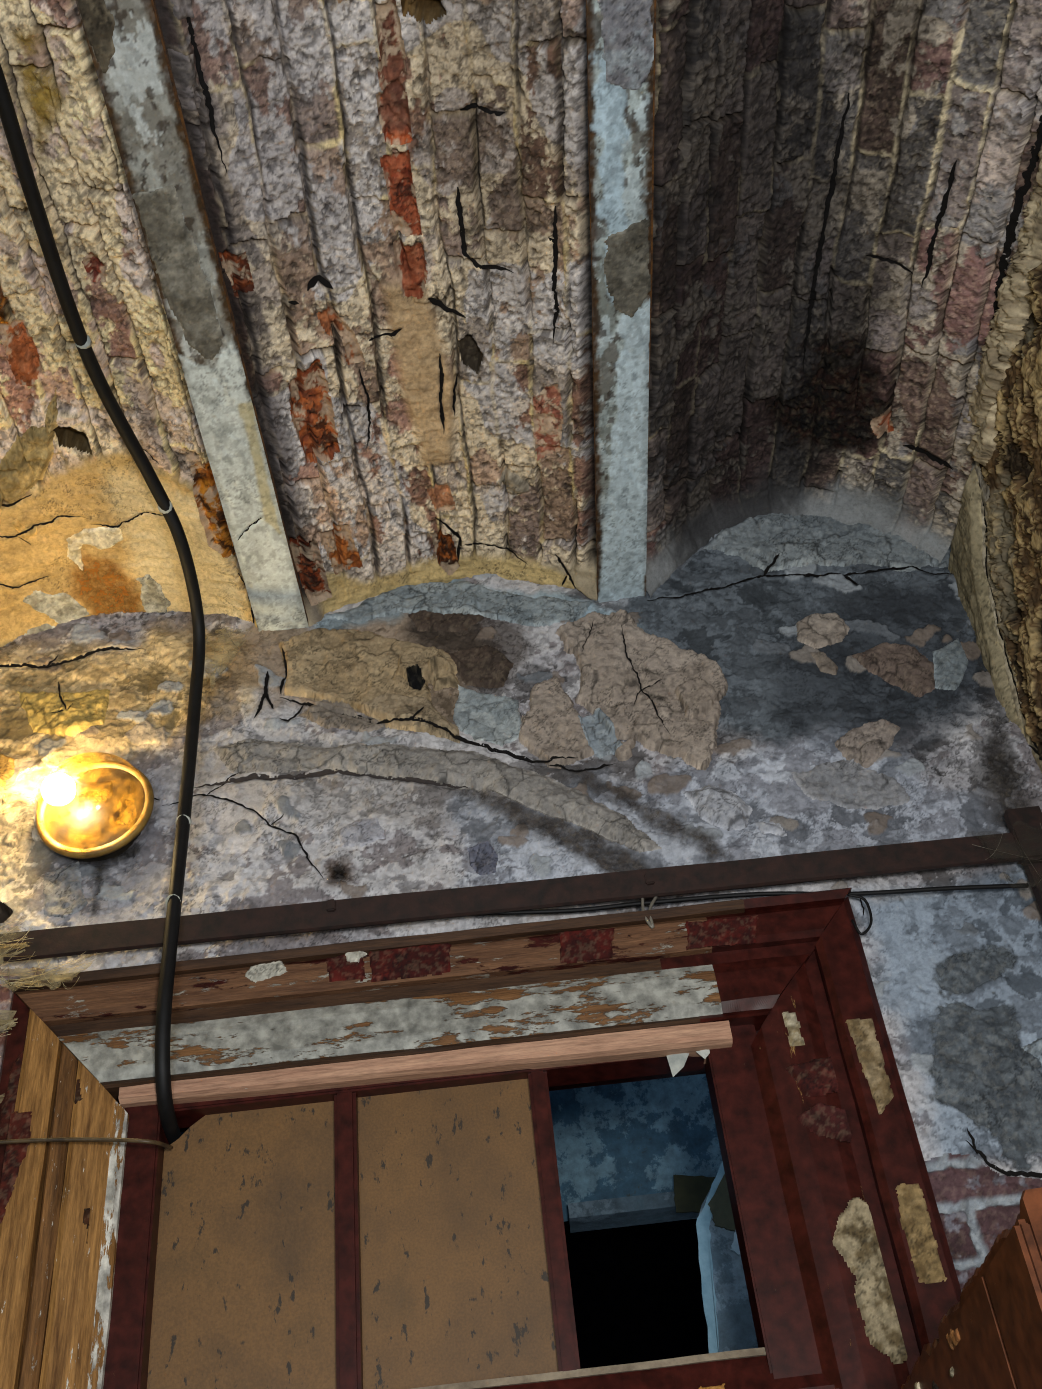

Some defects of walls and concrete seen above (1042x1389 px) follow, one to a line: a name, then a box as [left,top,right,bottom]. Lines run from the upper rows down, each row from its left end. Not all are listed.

spalling [375,0,446,299]
rust [0,288,14,324]
flaking render [962,150,1042,758]
crack [0,494,163,545]
crack [435,517,576,589]
crack [0,646,143,713]
crack [254,648,615,772]
flaking render [279,483,728,771]
crack [154,769,468,879]
flaking render [0,967,48,1071]
peeling [895,945,1042,1292]
crack [966,1128,1042,1178]